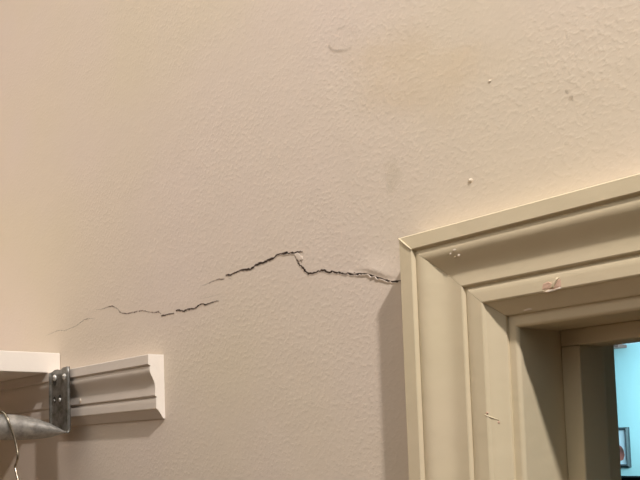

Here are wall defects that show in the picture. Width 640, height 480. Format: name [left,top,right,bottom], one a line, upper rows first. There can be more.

crack [209,247,401,285]
crack [104,301,219,317]